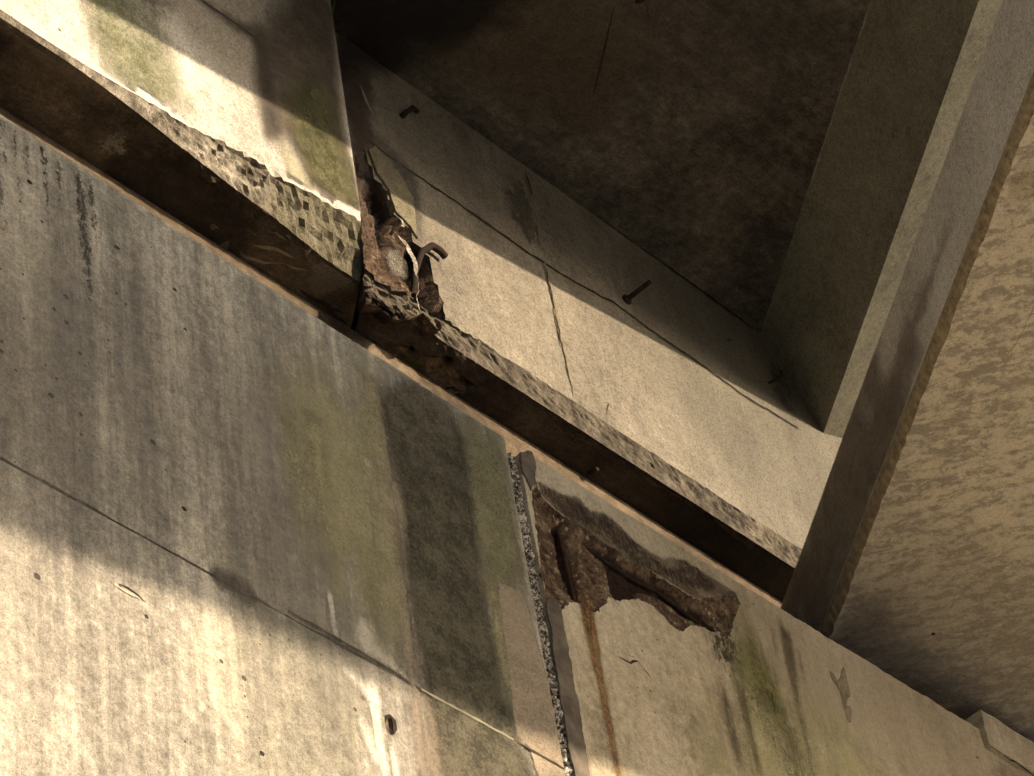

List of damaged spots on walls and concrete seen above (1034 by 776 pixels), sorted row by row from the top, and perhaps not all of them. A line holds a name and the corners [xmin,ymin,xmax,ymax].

leakage [0,120,62,214]
leakage [74,174,97,301]
spalling [354,145,448,336]
crack [520,167,575,400]
spalling [544,409,683,500]
spalling [532,482,741,639]
spalling [711,516,755,549]
corrosion [579,596,621,776]
leakage [709,619,740,675]
leakage [724,692,759,767]
leakage [780,626,814,775]